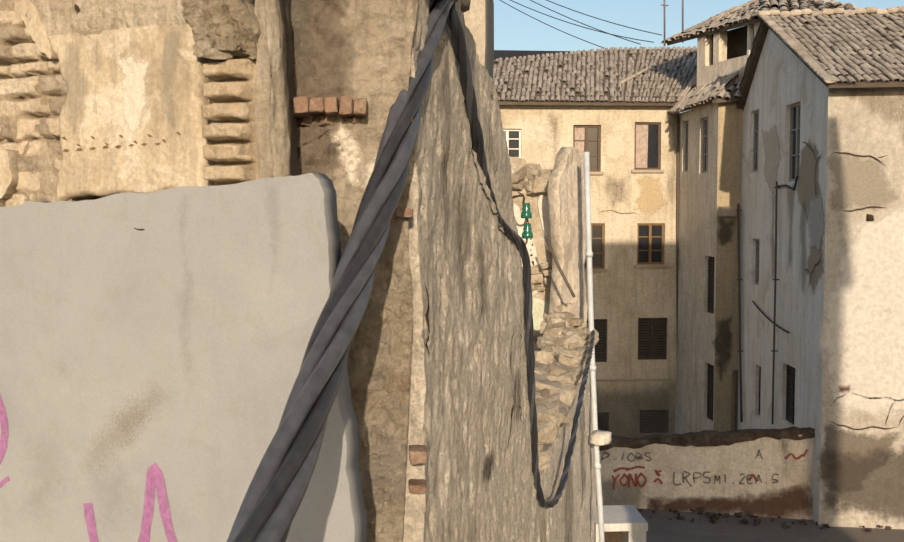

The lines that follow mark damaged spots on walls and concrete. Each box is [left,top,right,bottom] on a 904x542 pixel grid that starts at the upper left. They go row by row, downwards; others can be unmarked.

flaking render [14,0,59,60]
spalling [181,0,261,60]
flaking render [62,56,166,152]
flaking render [0,149,19,199]
flaking render [798,142,824,290]
peeling [532,291,550,351]
crack [828,392,904,430]
damp [483,455,494,478]
damp [825,452,904,518]